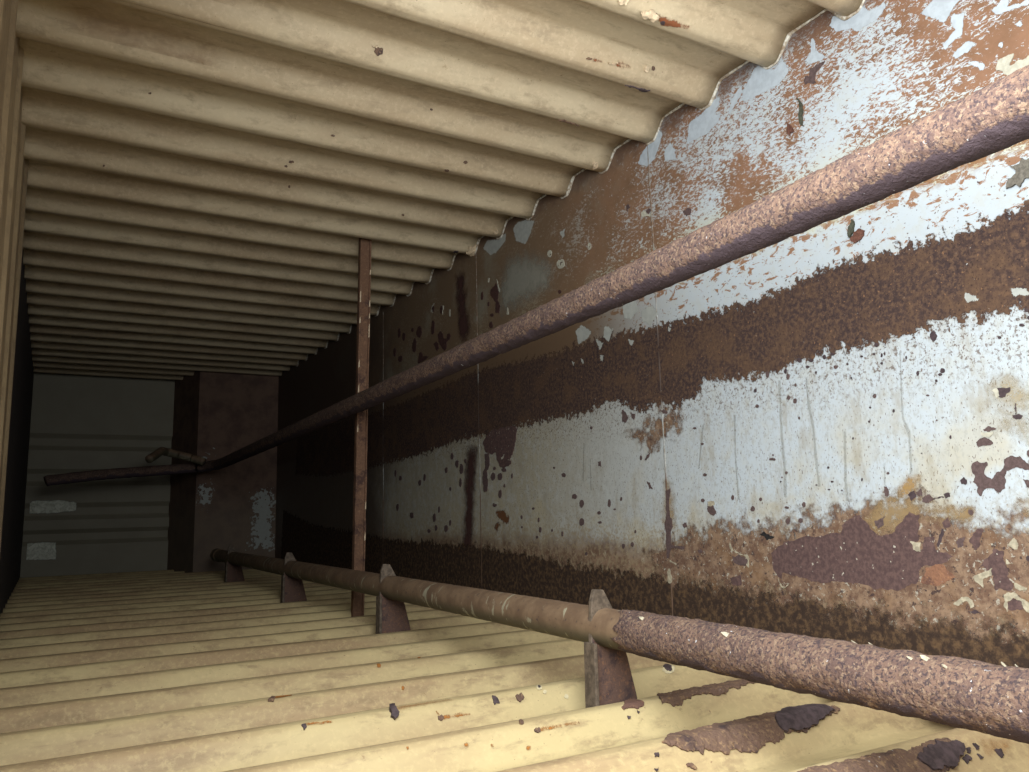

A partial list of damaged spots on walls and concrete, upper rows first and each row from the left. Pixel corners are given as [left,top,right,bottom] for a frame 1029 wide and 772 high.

peeling [920,0,1029,75]
peeling [729,60,789,114]
peeling [804,61,825,85]
peeling [638,130,676,166]
peeling [453,220,534,257]
peeling [992,387,1023,419]
rust [295,199,1029,668]
peeling [976,426,996,447]
peeling [960,450,1029,496]
rust [281,510,353,569]
peeling [771,488,1029,614]
peeling [962,743,1007,764]